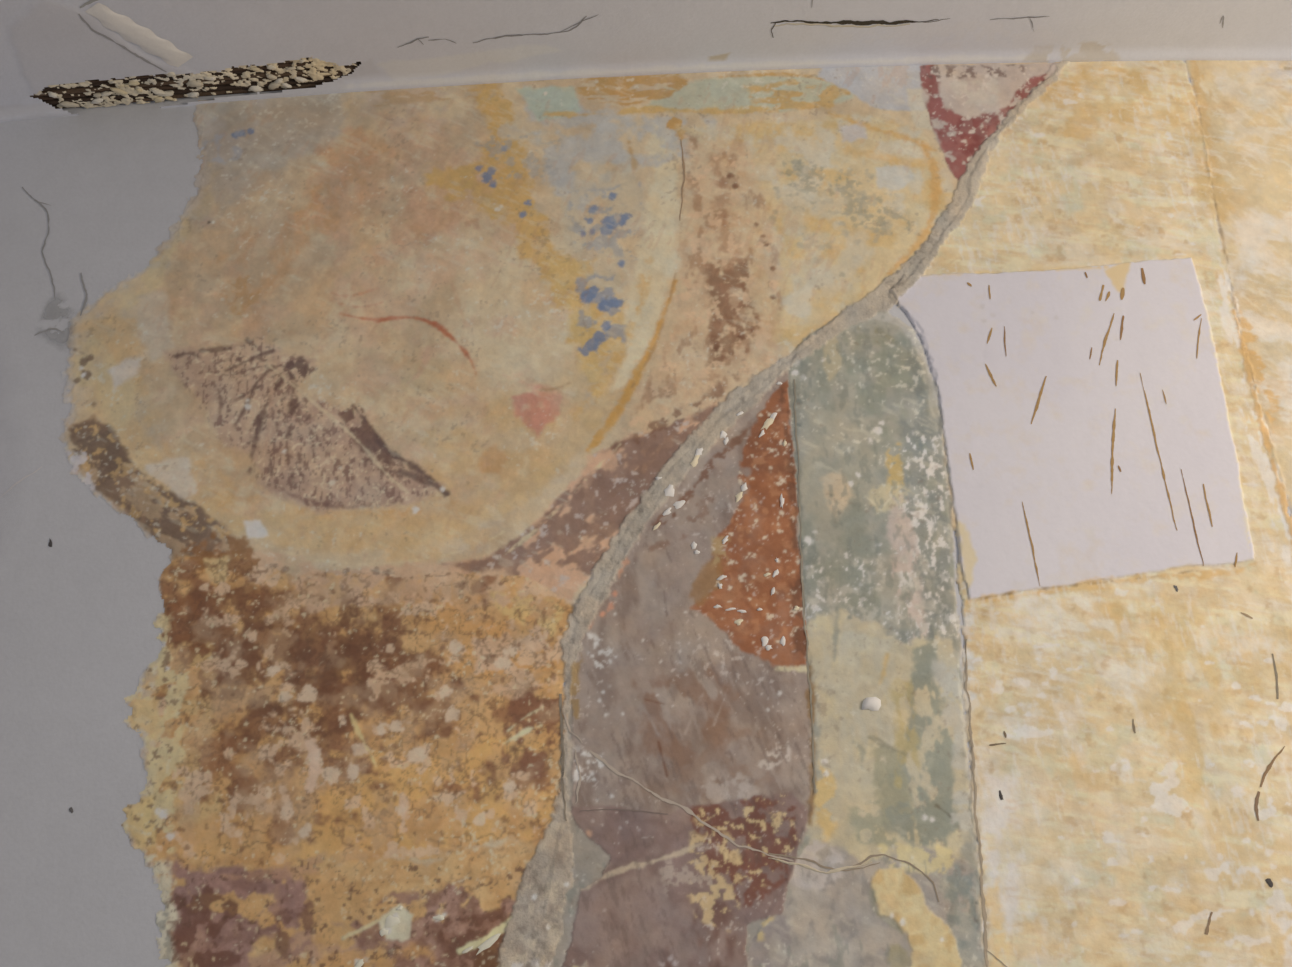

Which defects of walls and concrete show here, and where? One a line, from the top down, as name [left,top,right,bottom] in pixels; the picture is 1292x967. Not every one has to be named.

spalling [30,57,361,109]
crack [771,0,950,37]
crack [22,187,88,336]
peeling [924,60,1292,967]
crack [559,694,940,902]